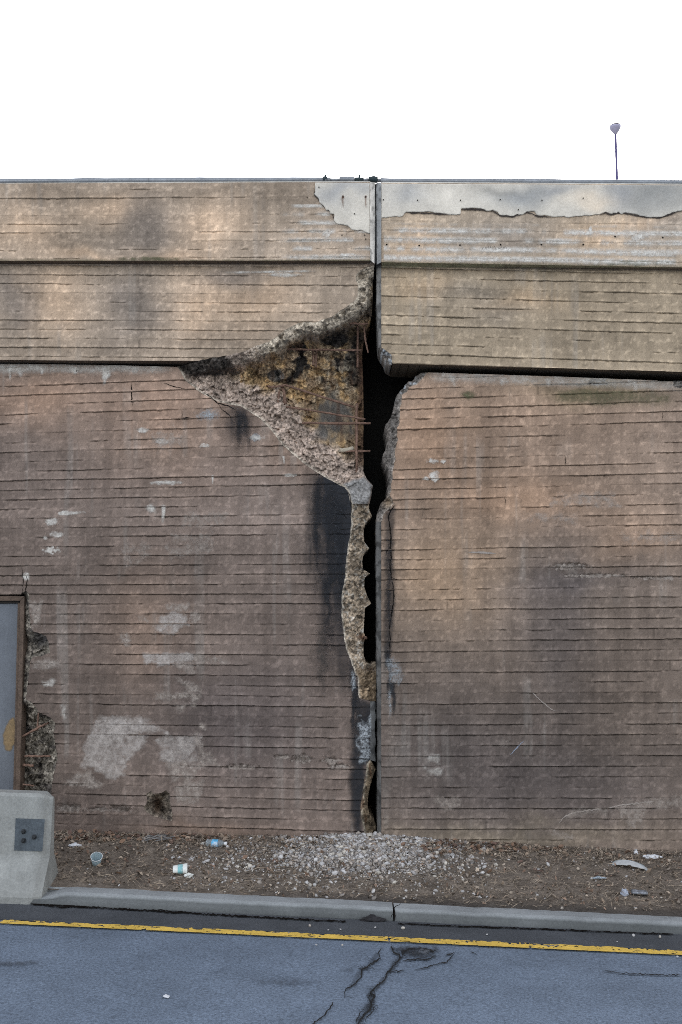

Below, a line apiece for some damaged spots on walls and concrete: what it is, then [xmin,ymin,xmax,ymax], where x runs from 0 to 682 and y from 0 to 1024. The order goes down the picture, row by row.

peeling [314,183,682,234]
leakage [231,409,260,441]
spalling [178,266,427,701]
leakage [310,476,352,641]
crack [386,506,397,649]
spalling [22,591,58,794]
peeling [143,653,197,669]
peeling [70,718,259,821]
crack [312,904,679,1024]